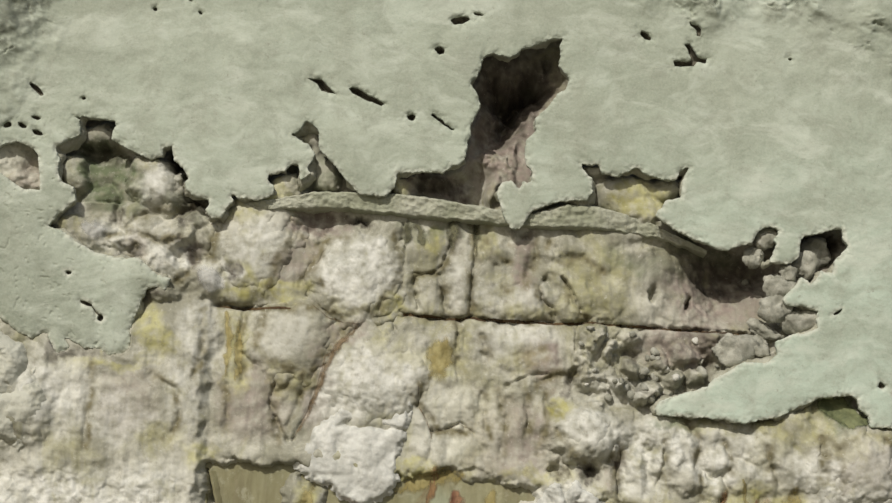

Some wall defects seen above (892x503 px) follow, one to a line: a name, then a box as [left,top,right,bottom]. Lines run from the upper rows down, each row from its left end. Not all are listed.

spalling [4,116,43,136]
spalling [0,142,40,190]
spalling [50,120,221,298]
water stain [404,221,425,248]
spalling [197,41,853,503]
water stain [223,311,243,380]
crack [222,304,291,312]
water stain [427,339,453,377]
crack [403,313,744,335]
spalling [0,287,220,503]
water stain [293,401,464,503]
corrosion [450,491,462,503]